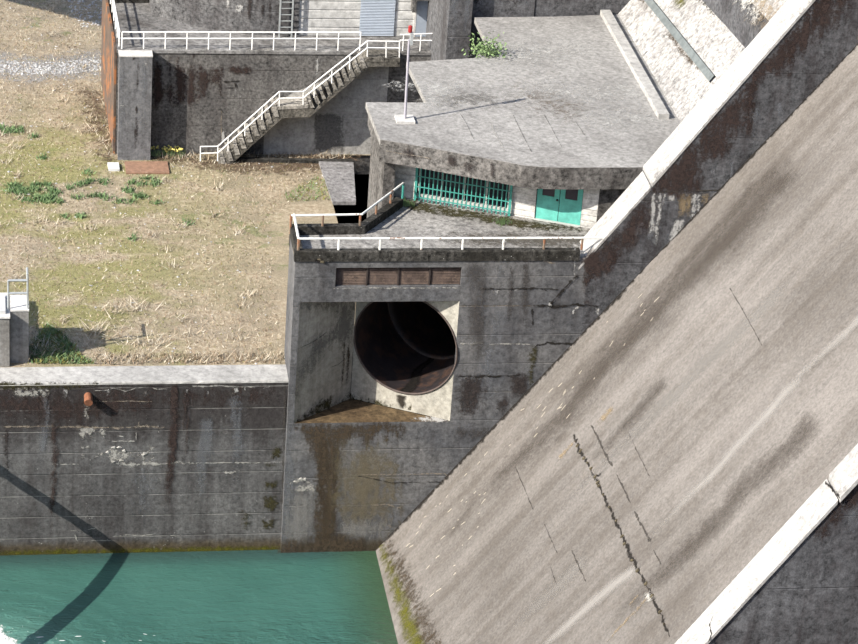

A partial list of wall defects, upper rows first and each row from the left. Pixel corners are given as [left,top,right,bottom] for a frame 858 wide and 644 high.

water stain [518,176,785,460]
water stain [50,425,59,516]
spalling [98,445,155,463]
water stain [165,385,189,494]
water stain [285,422,405,545]
crack [359,276,634,543]
crack [515,467,586,582]
crack [573,426,670,637]
water stain [696,385,792,489]
water stain [553,569,633,638]